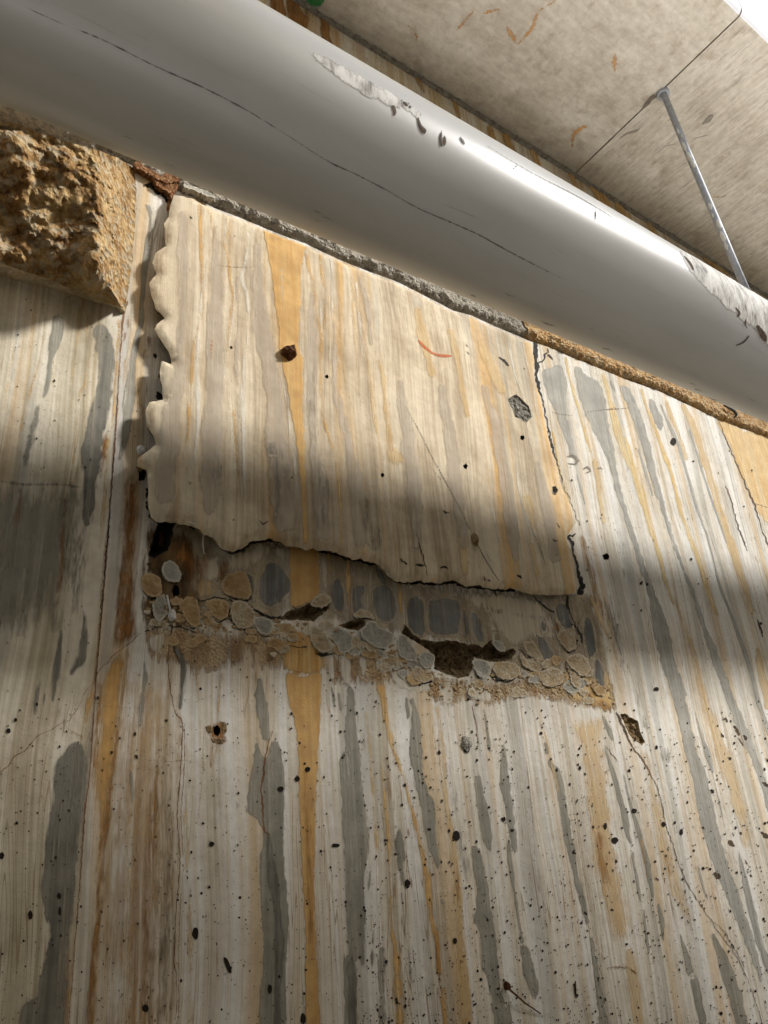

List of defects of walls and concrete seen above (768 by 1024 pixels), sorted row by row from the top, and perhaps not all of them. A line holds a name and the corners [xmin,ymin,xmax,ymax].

spalling [0,104,165,313]
leakage [0,204,190,627]
corrosion [132,161,180,211]
corrosion [264,230,366,608]
crack [146,342,586,677]
peeling [141,522,645,745]
spalling [177,178,768,440]
leakage [542,365,768,981]
leakage [247,679,289,1024]
corrosion [286,672,321,1024]
leakage [331,687,386,1024]
crack [616,712,763,1024]